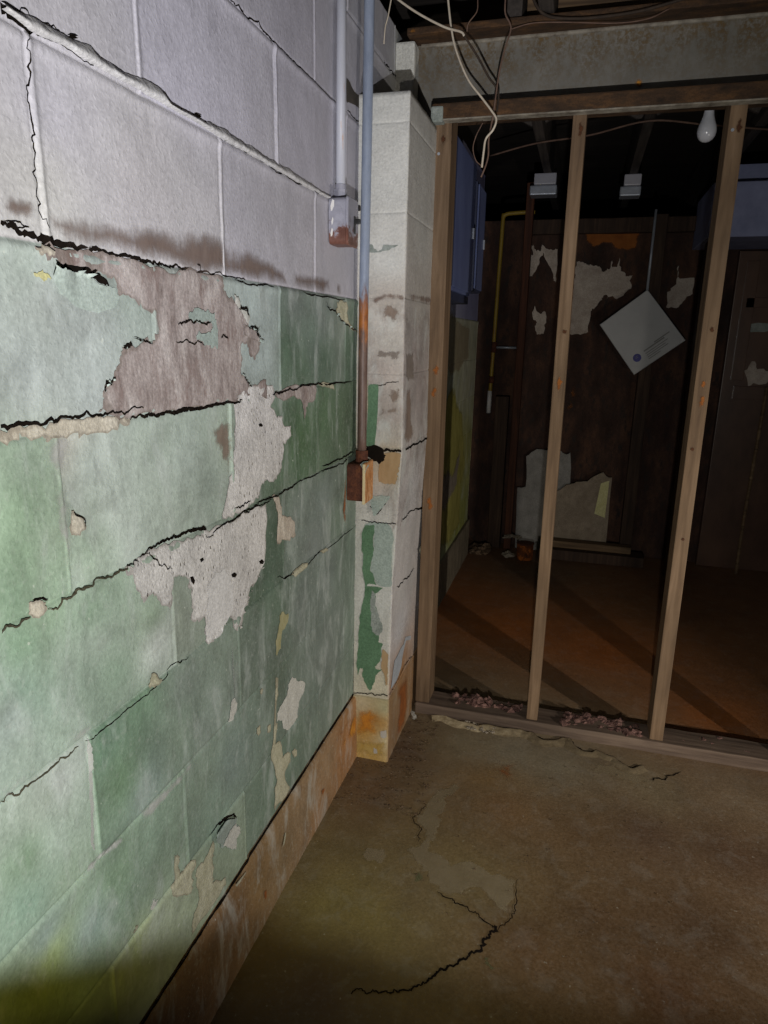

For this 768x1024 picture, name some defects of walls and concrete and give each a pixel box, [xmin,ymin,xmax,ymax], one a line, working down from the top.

water stain [10,202,30,213]
crack [0,2,273,287]
water stain [64,226,283,279]
water stain [297,278,326,290]
peeling [570,258,632,335]
crack [1,399,242,431]
peeling [0,241,296,644]
crack [2,438,427,633]
peeling [356,495,411,690]
crack [0,658,188,803]
peeling [257,677,305,810]
corrosion [350,682,406,756]